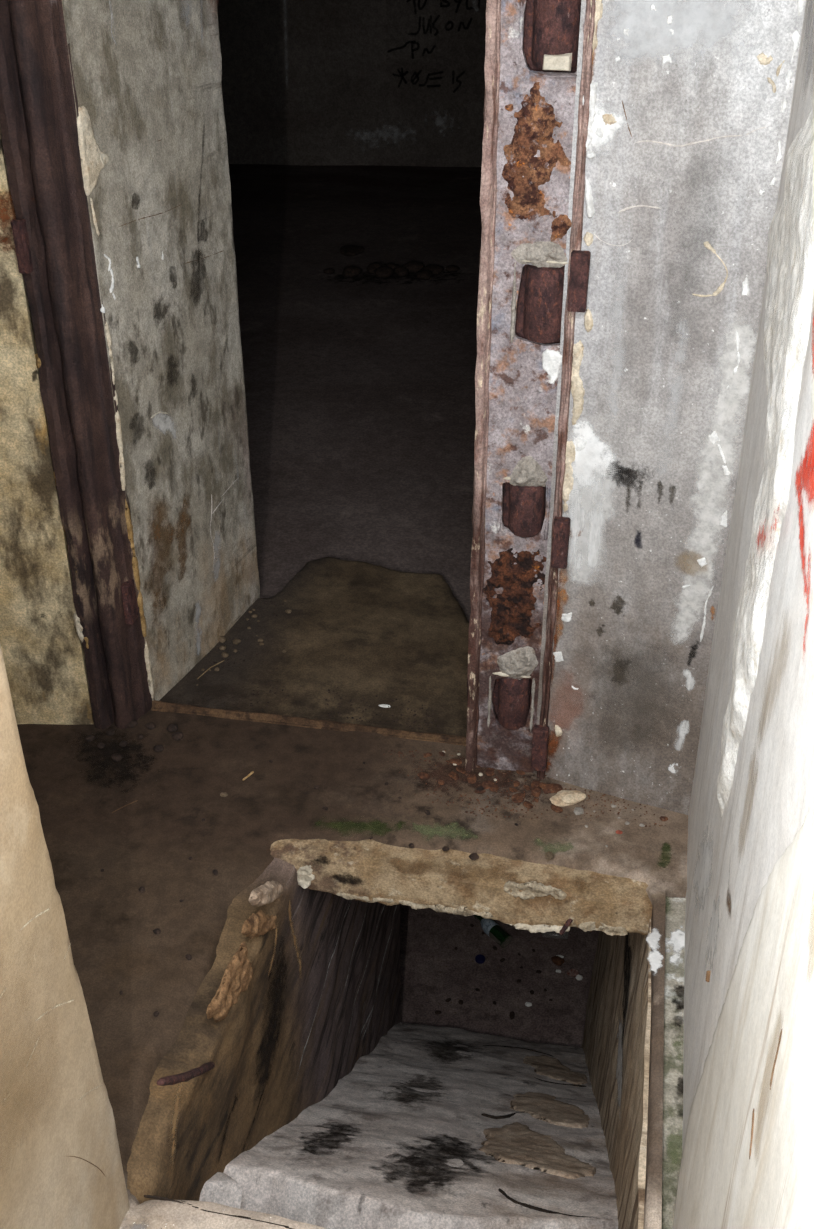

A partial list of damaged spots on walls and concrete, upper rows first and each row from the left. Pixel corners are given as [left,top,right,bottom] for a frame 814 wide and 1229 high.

spalling [77,106,109,236]
rust [502,82,572,242]
leakage [170,191,208,301]
leakage [153,300,169,323]
leakage [129,341,138,365]
leakage [167,356,196,397]
leakage [129,413,144,443]
leakage [145,460,156,489]
rust [483,548,568,685]